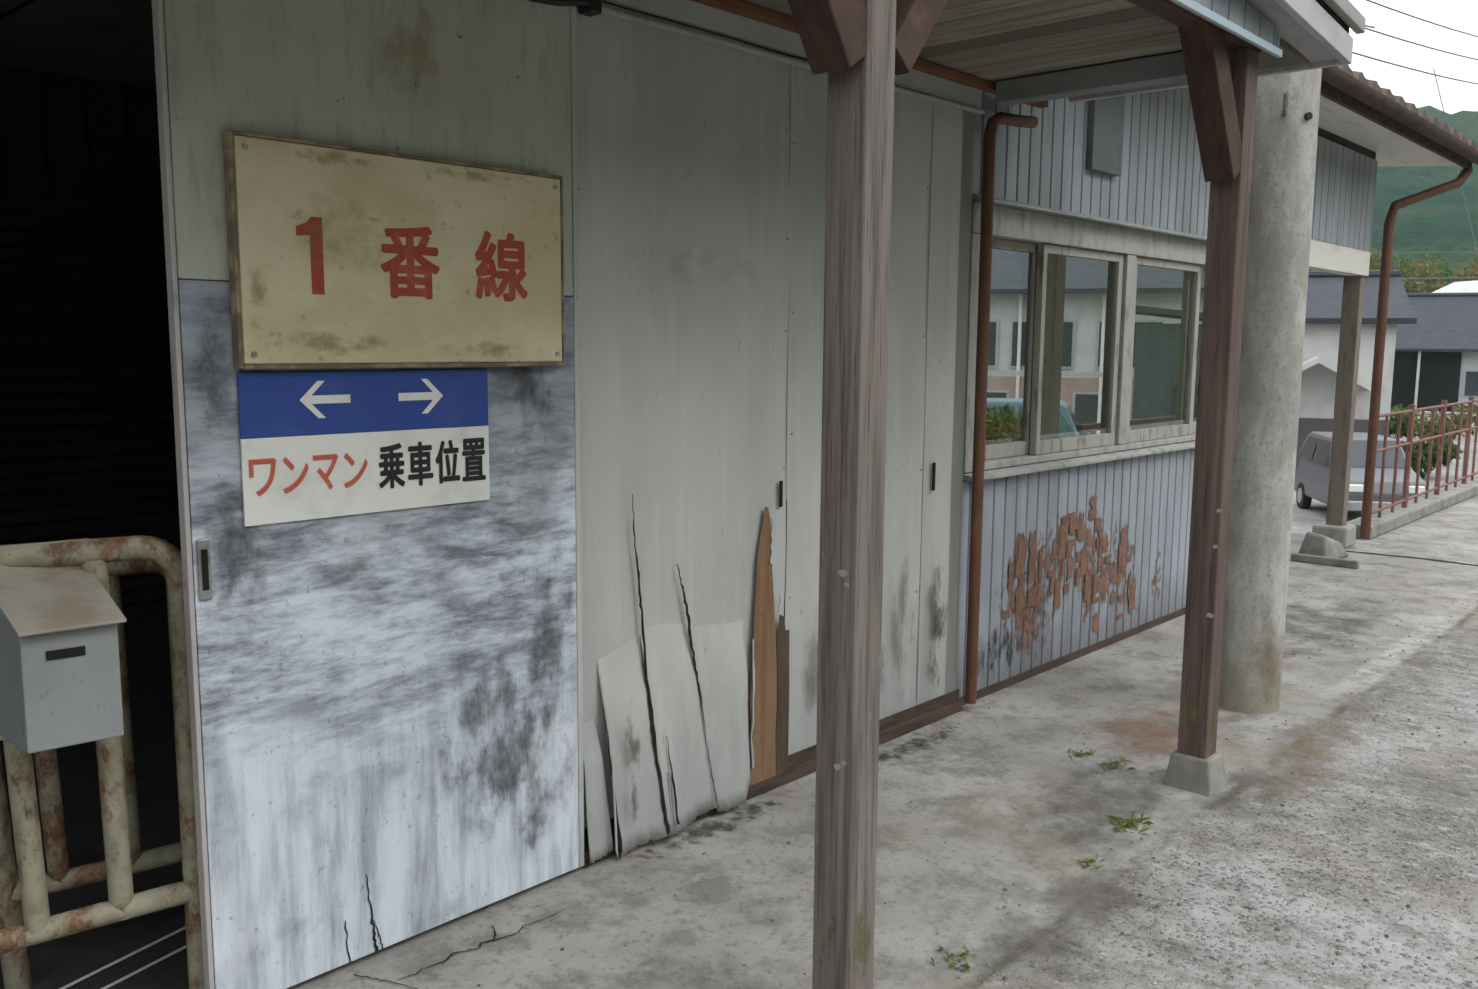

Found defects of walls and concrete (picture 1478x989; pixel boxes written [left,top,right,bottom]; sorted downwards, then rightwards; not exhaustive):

damp [465,680,513,727]
damp [467,734,530,792]
crack [603,707,622,853]
crack [632,494,680,833]
crack [677,564,717,801]
peeling [750,506,789,786]